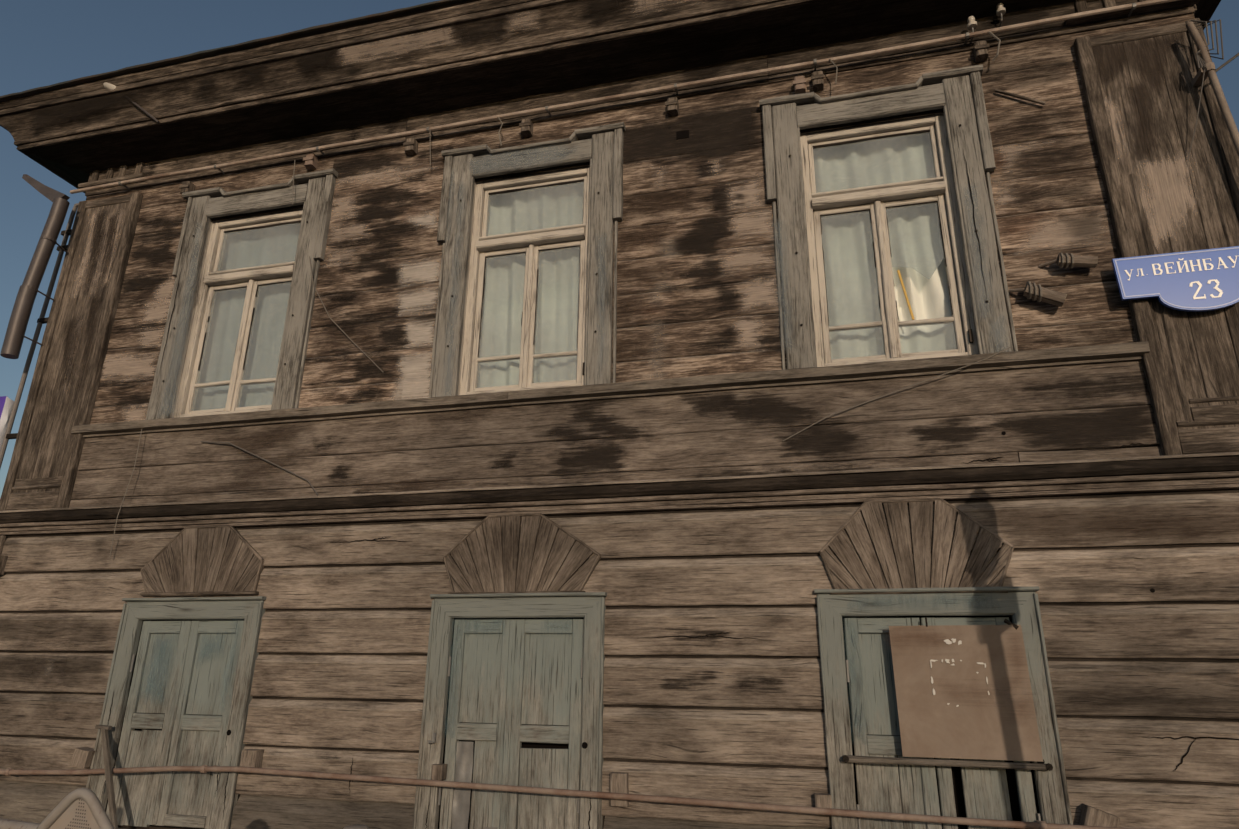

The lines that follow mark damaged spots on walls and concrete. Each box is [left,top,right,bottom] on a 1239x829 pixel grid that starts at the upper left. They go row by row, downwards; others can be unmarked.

damp [333,155,398,180]
damp [418,147,453,158]
damp [618,98,764,358]
damp [117,216,184,309]
damp [305,173,437,404]
damp [112,323,166,357]
damp [753,333,781,351]
damp [98,378,154,409]
damp [354,400,650,501]
damp [681,392,871,478]
damp [327,465,352,479]